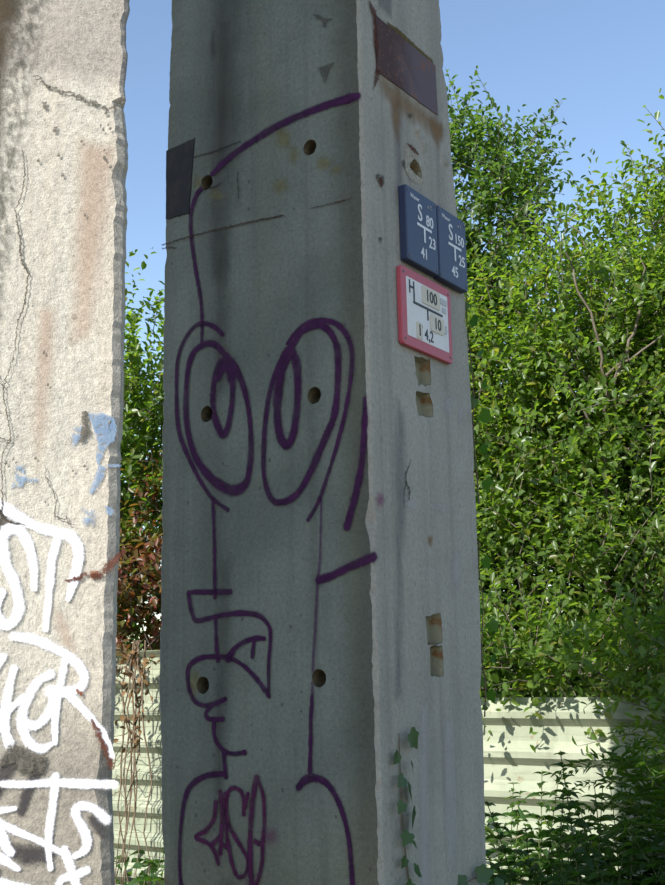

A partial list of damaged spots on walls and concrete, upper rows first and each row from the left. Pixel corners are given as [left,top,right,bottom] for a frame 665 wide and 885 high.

damp [0,0,17,58]
corrosion [369,0,379,58]
crack [0,150,30,525]
spalling [72,411,90,445]
crack [45,467,75,525]
corrosion [66,549,126,582]
corrosion [90,719,114,769]